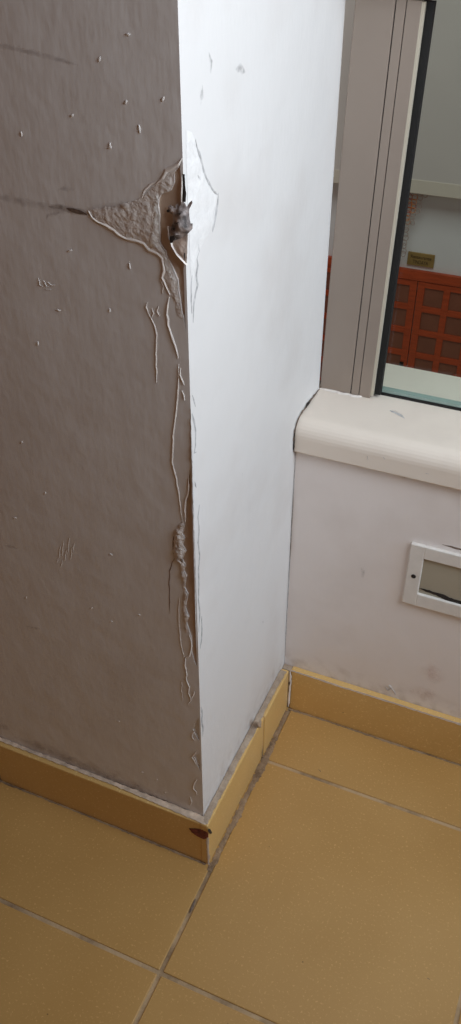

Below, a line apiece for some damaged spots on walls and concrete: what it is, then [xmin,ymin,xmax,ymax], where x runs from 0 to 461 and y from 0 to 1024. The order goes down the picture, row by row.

flaking render [67,130,219,359]
crack [145,302,203,649]